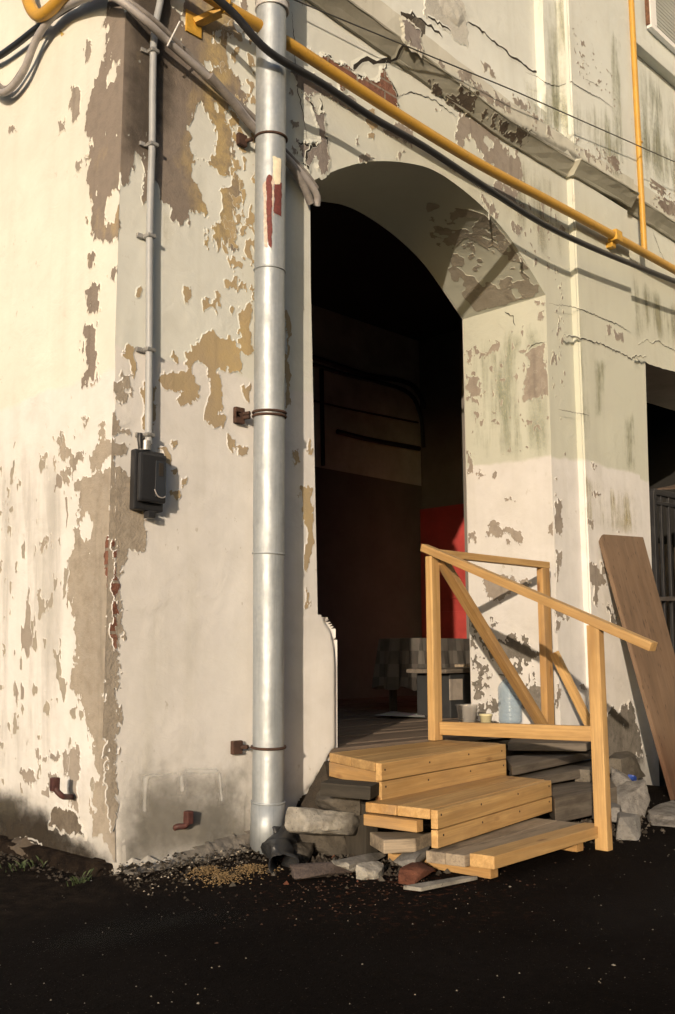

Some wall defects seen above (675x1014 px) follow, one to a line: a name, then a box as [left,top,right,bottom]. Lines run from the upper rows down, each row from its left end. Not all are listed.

spalling [288,68,414,180]
spalling [306,46,400,109]
spalling [399,16,425,58]
crack [409,9,605,102]
peeling [426,57,624,434]
crack [530,303,675,362]
peeling [0,0,256,862]
peeling [297,484,315,573]
peeling [468,519,524,546]
peeling [470,620,510,721]
peeling [489,616,541,711]
peeling [607,699,648,759]